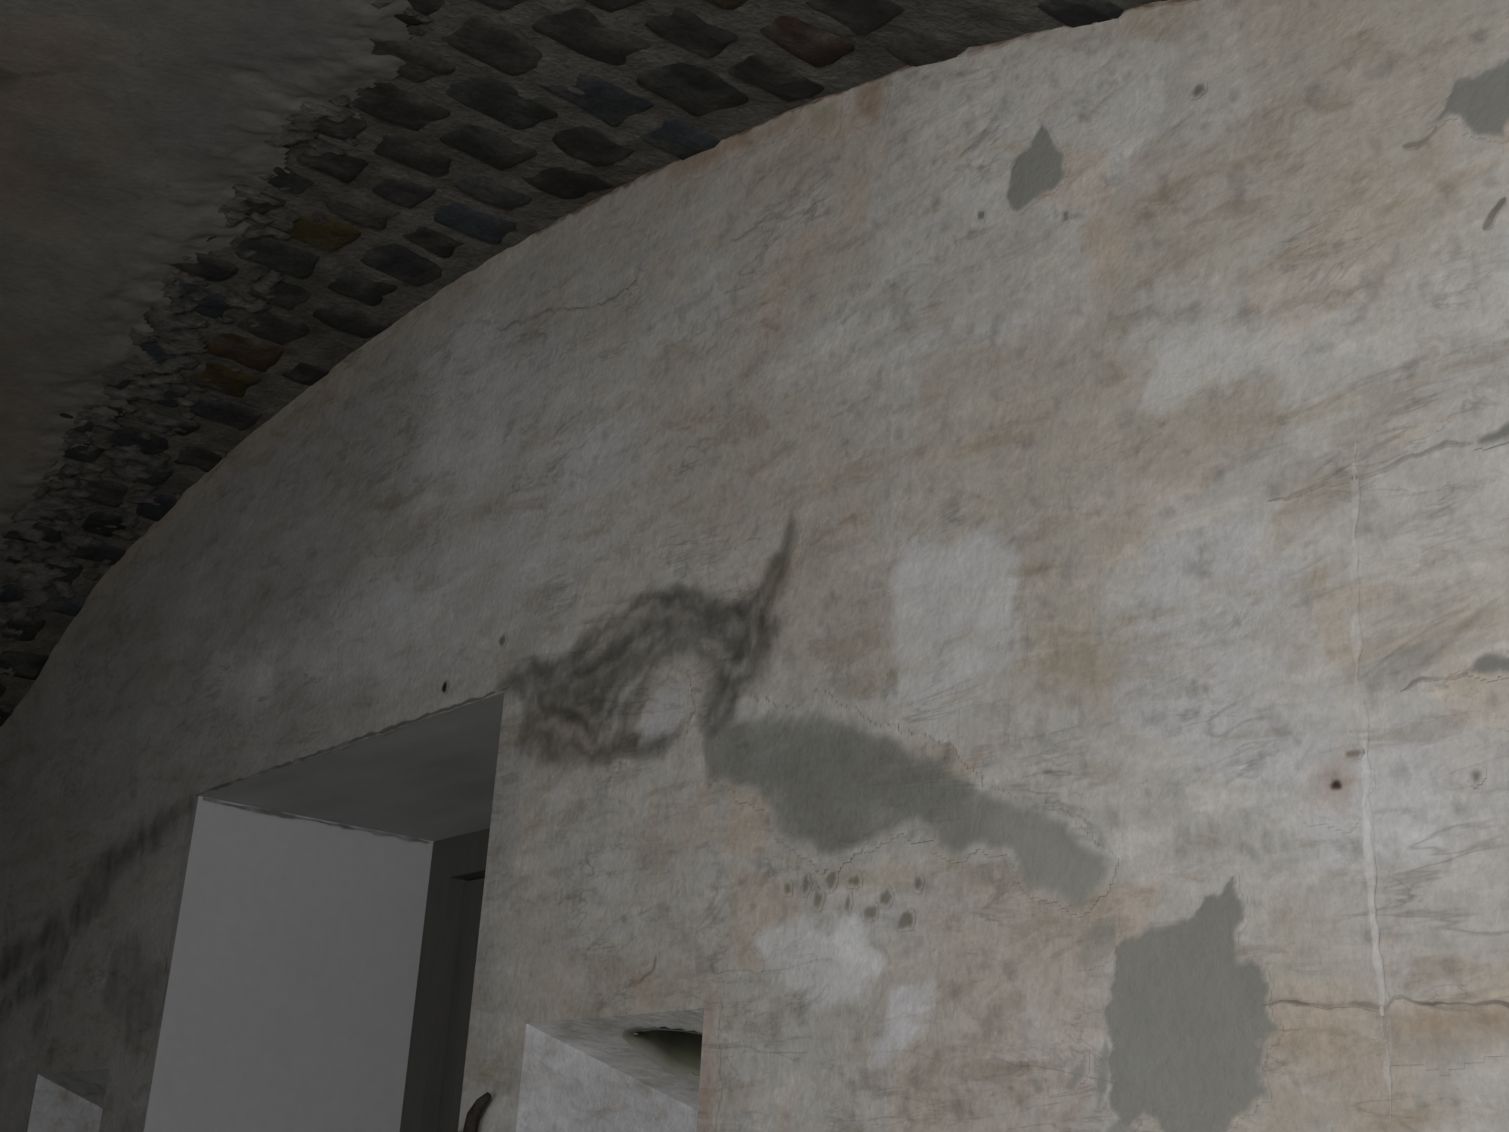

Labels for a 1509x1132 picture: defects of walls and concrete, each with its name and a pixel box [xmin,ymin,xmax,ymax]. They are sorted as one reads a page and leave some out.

flaking render [1189,80,1207,100]
peeling [1402,52,1509,150]
flaking render [1482,197,1507,230]
flaking render [0,0,1168,727]
peeling [1130,299,1287,424]
crack [1267,416,1509,502]
water stain [490,493,982,874]
crack [1401,647,1509,691]
peeling [1028,871,1284,1132]
crack [1261,994,1509,1012]